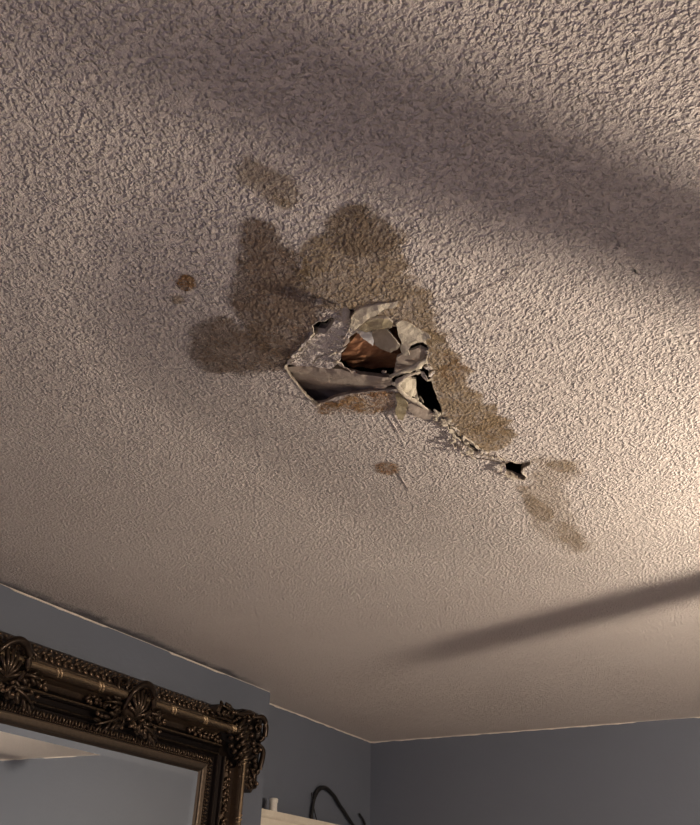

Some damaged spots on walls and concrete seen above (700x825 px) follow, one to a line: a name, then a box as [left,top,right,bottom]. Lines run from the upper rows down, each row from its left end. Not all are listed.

peeling [284,332,315,369]
damp [190,206,518,452]
peeling [330,316,431,373]
peeling [415,365,435,381]
crack [432,409,506,463]